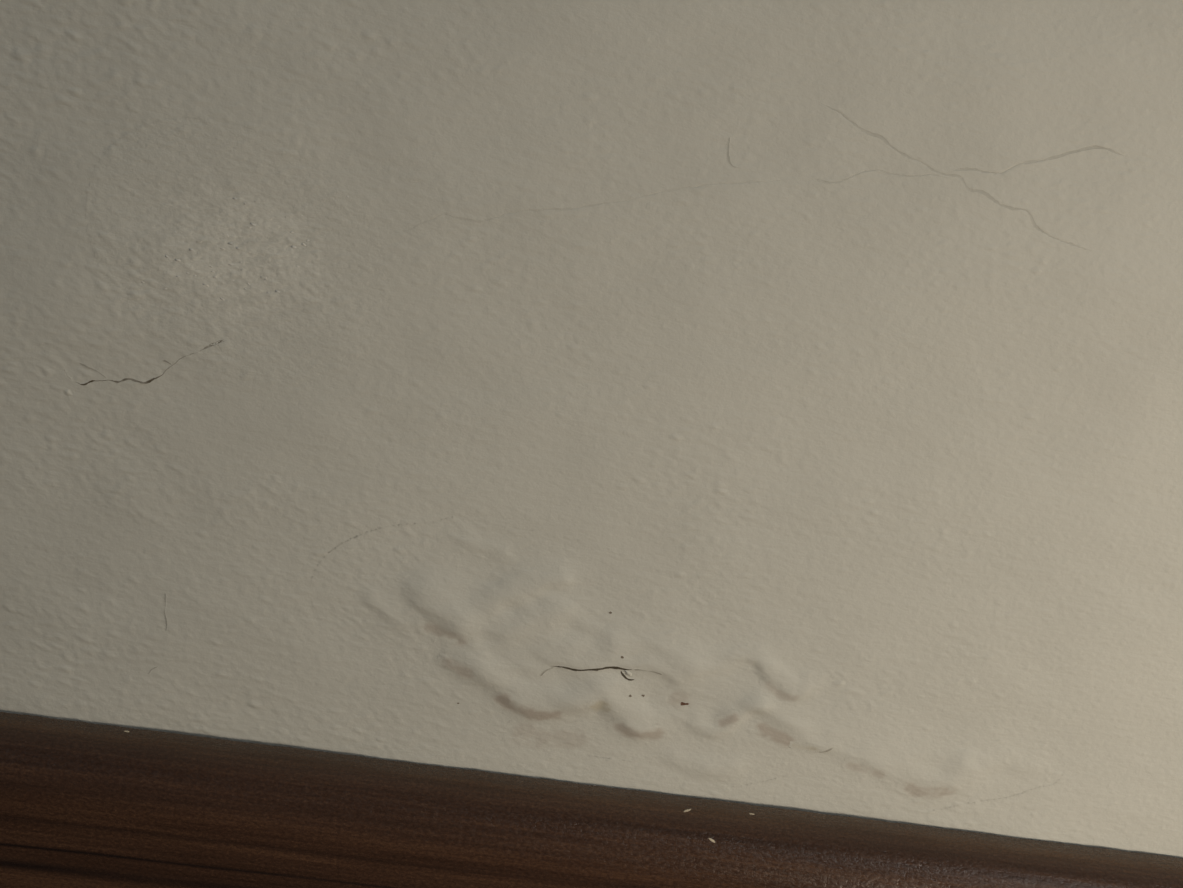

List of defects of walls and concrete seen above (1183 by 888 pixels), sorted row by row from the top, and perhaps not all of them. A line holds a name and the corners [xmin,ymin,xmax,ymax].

crack [63,339,229,386]
crack [539,665,663,681]